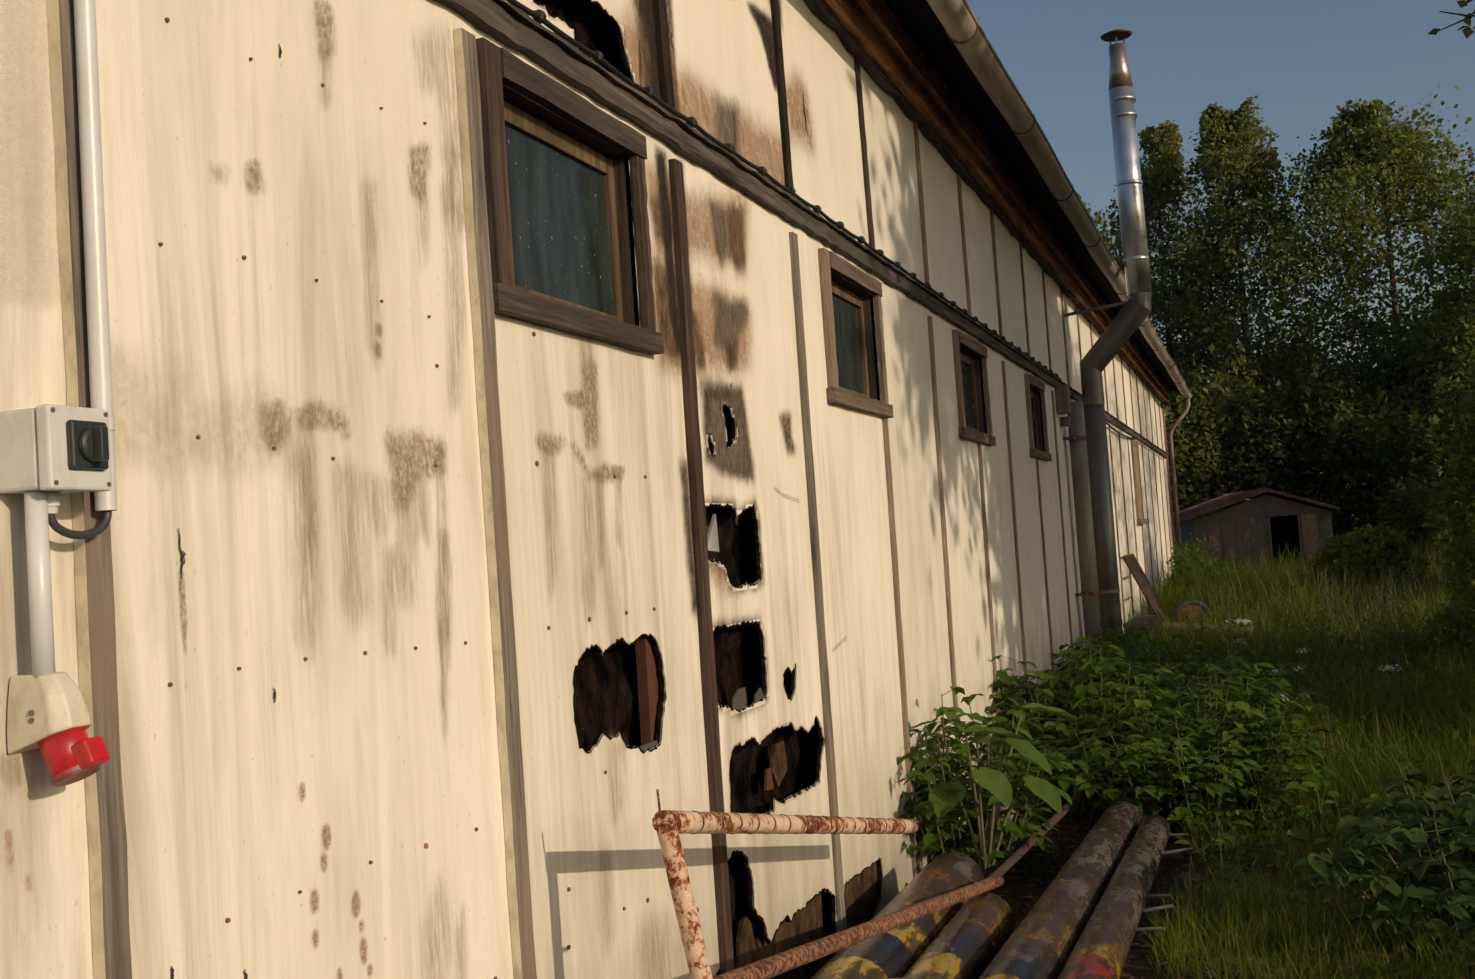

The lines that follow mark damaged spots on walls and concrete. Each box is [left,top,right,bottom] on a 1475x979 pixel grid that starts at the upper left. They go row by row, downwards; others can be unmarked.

water stain [412,148,427,196]
water stain [265,405,346,446]
water stain [388,433,443,504]
peeling [732,687,764,710]